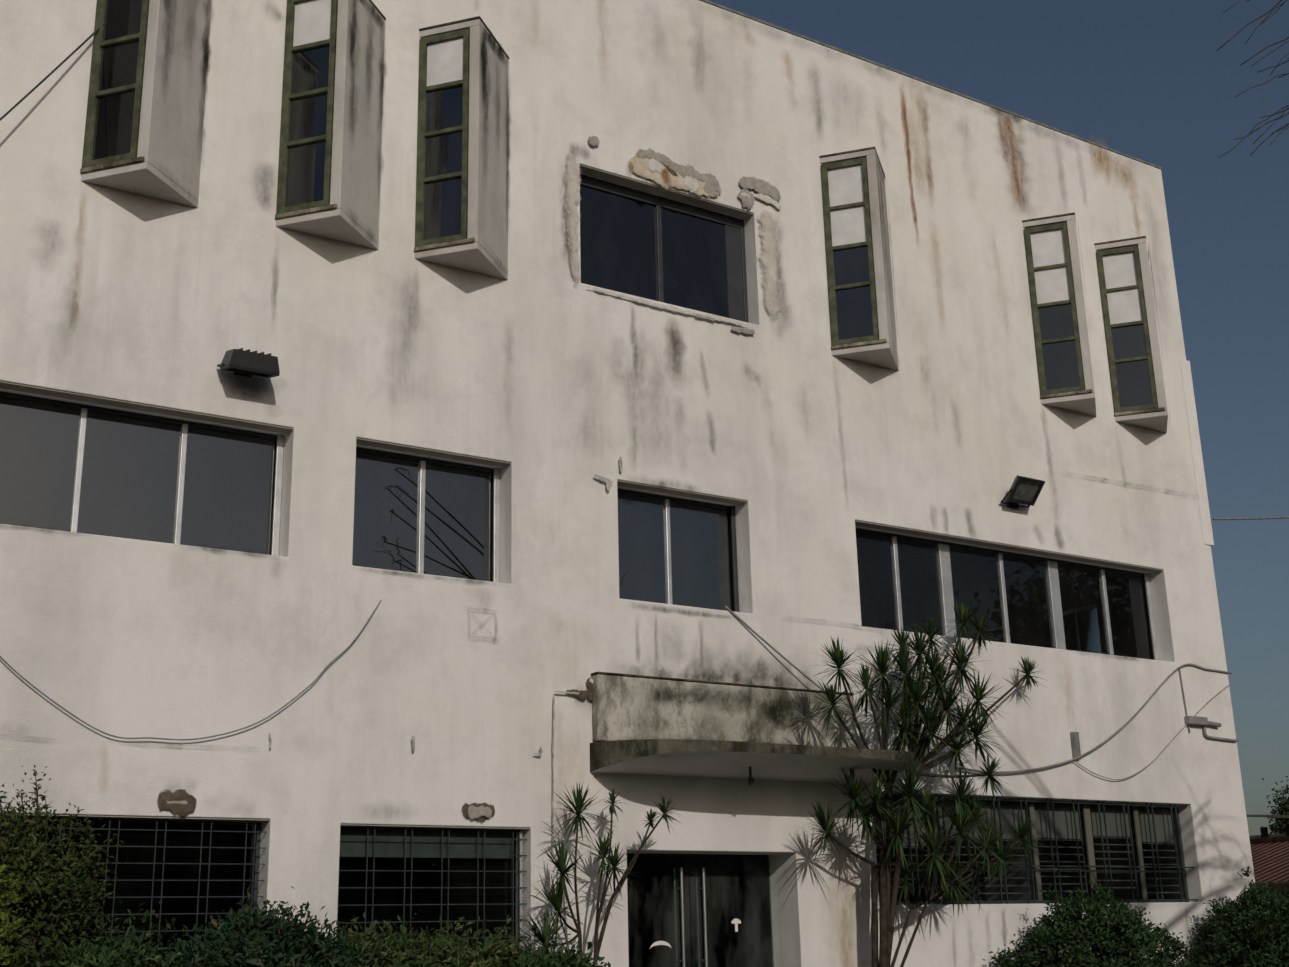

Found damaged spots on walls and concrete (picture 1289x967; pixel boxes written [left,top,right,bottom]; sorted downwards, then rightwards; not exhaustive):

corrosion [902,99,916,222]
corrosion [997,109,1020,197]
flaking render [563,136,755,335]
flaking render [738,176,782,317]